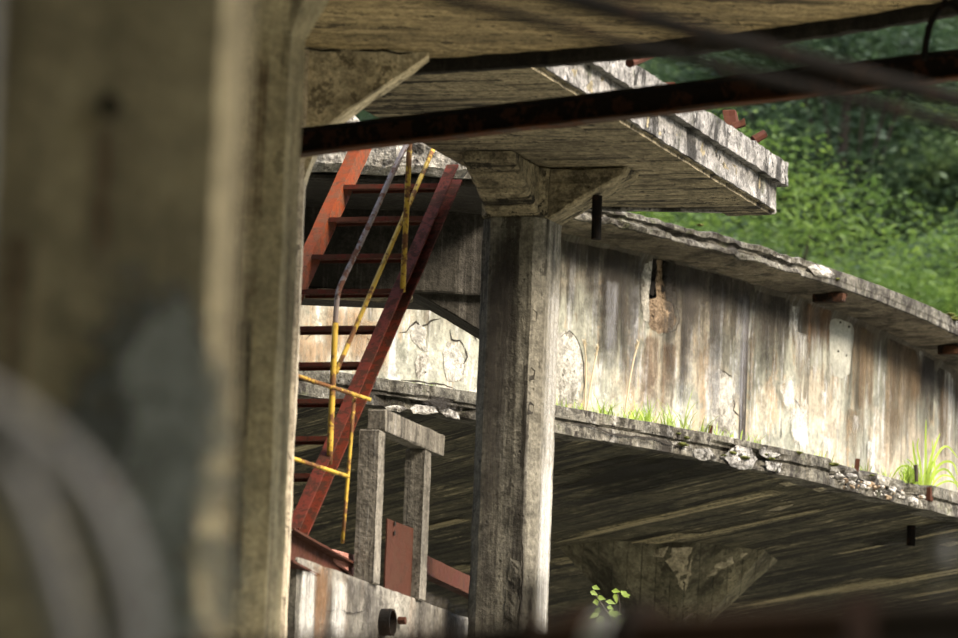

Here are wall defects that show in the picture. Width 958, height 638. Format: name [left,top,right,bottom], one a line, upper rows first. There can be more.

crack [400,318,478,363]
leakage [562,242,641,364]
leakage [665,260,804,384]
crack [401,380,455,389]
crack [560,422,694,450]
leakage [783,381,808,449]
spalling [830,470,933,507]